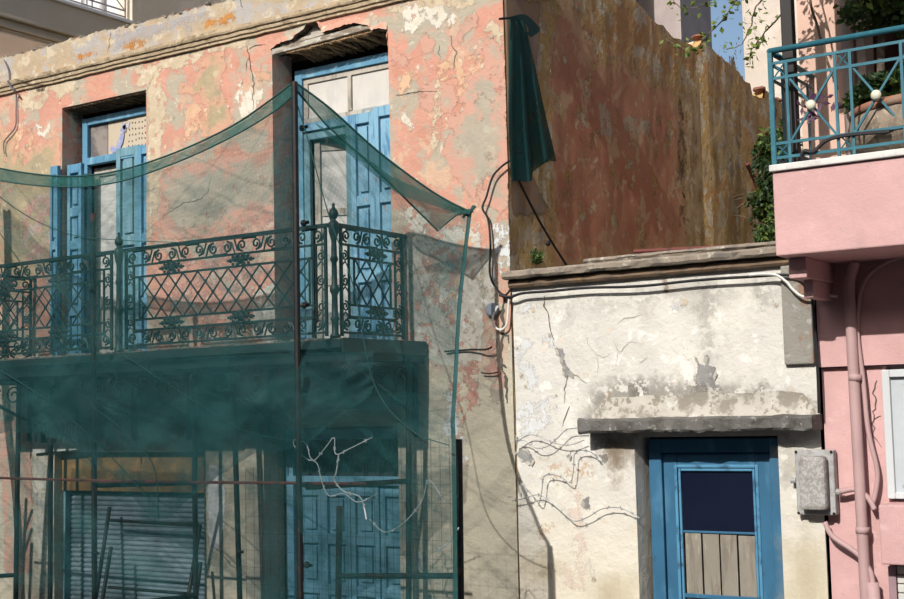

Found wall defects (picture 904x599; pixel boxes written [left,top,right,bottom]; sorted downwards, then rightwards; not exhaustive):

crack [246,44,262,108]
peeling [270,0,706,466]
crack [500,298,518,438]